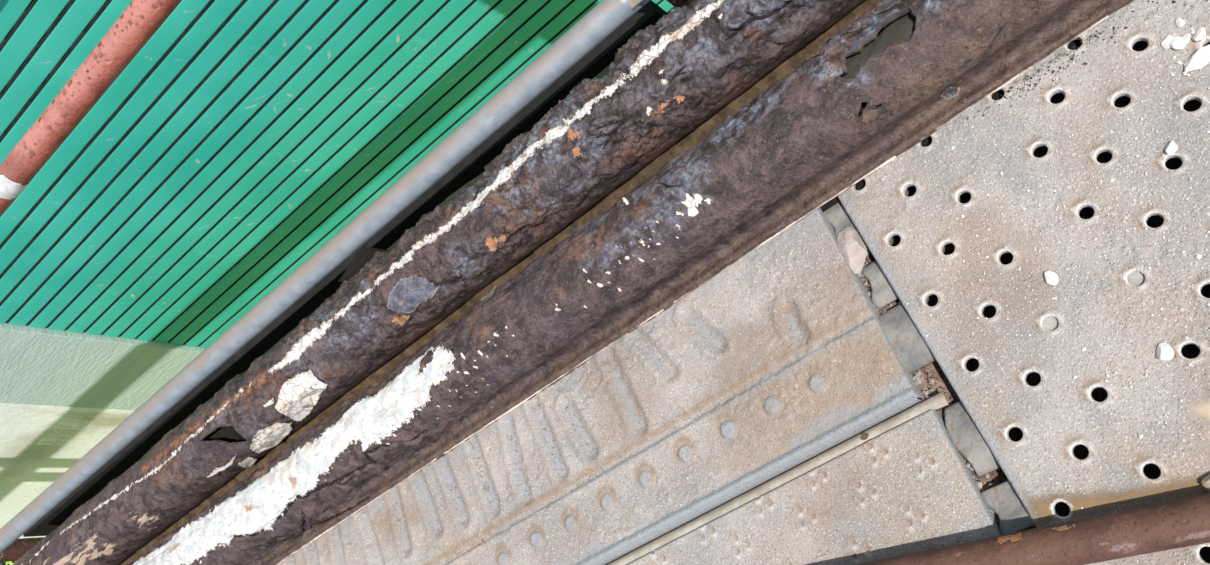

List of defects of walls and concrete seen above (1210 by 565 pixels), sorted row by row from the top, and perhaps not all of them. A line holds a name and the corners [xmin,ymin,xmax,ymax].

corrosion [650,95,685,117]
corrosion [861,109,877,124]
corrosion [560,128,583,159]
corrosion [482,194,512,209]
corrosion [756,156,896,249]
corrosion [485,234,508,252]
peeling [129,0,725,565]
corrosion [282,348,605,561]
peeling [22,381,252,565]
corrosion [1032,480,1205,531]
corrosion [998,533,1022,544]